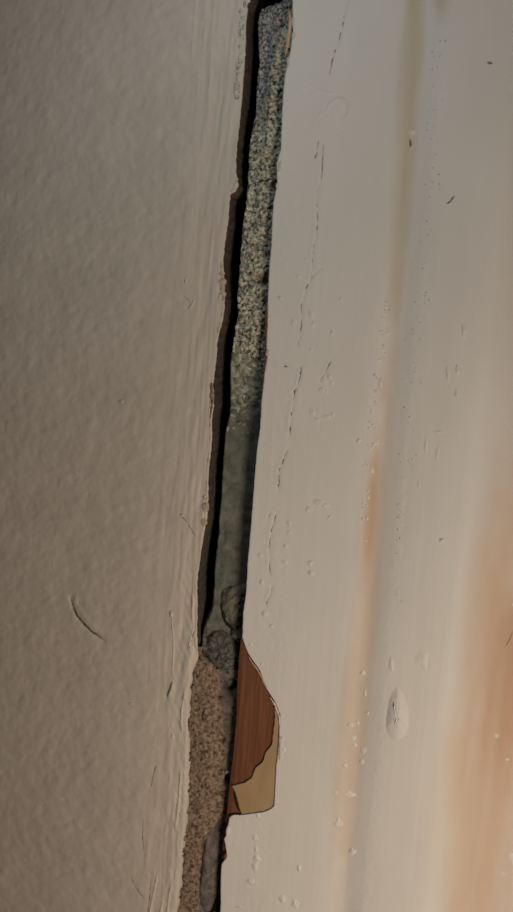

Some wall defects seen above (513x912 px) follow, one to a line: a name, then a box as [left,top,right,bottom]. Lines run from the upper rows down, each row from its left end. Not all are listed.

crack [264,0,283,8]
crack [236,202,246,283]
crack [222,316,238,471]
crack [269,361,302,489]
crack [182,501,240,658]
spalling [177,590,283,912]
crack [210,850,224,912]